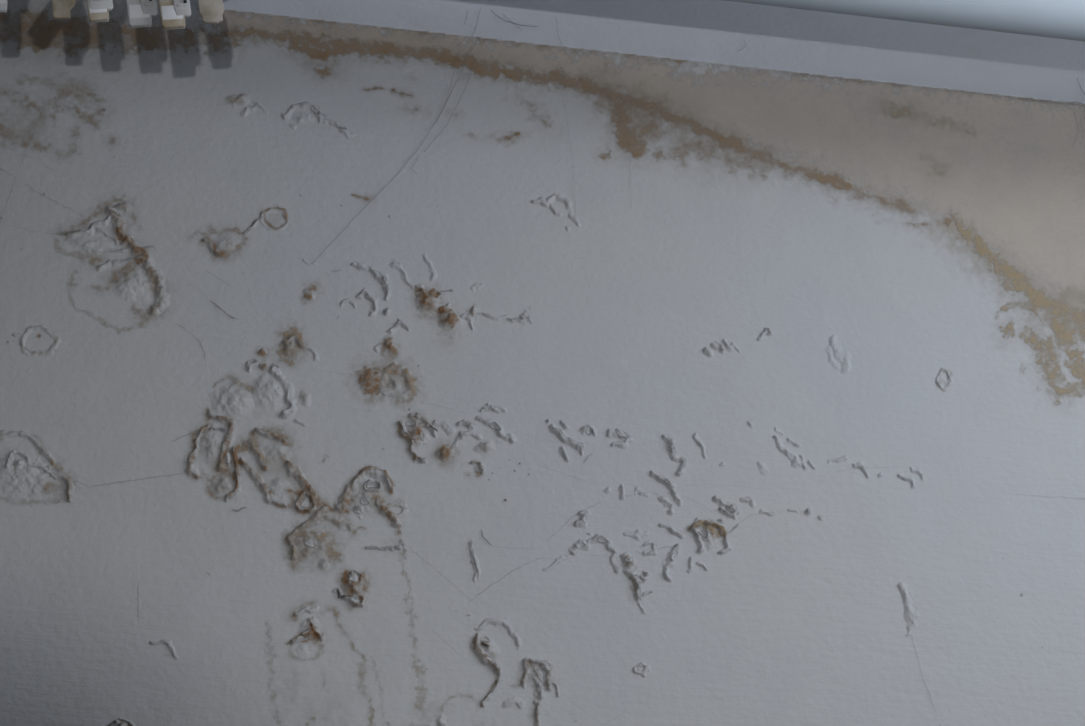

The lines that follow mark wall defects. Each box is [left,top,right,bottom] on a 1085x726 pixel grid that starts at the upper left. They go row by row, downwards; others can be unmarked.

damp [0,9,1085,404]
peeling [339,261,418,335]
peeling [542,432,824,614]
crack [896,582,920,637]
peeling [470,617,560,726]